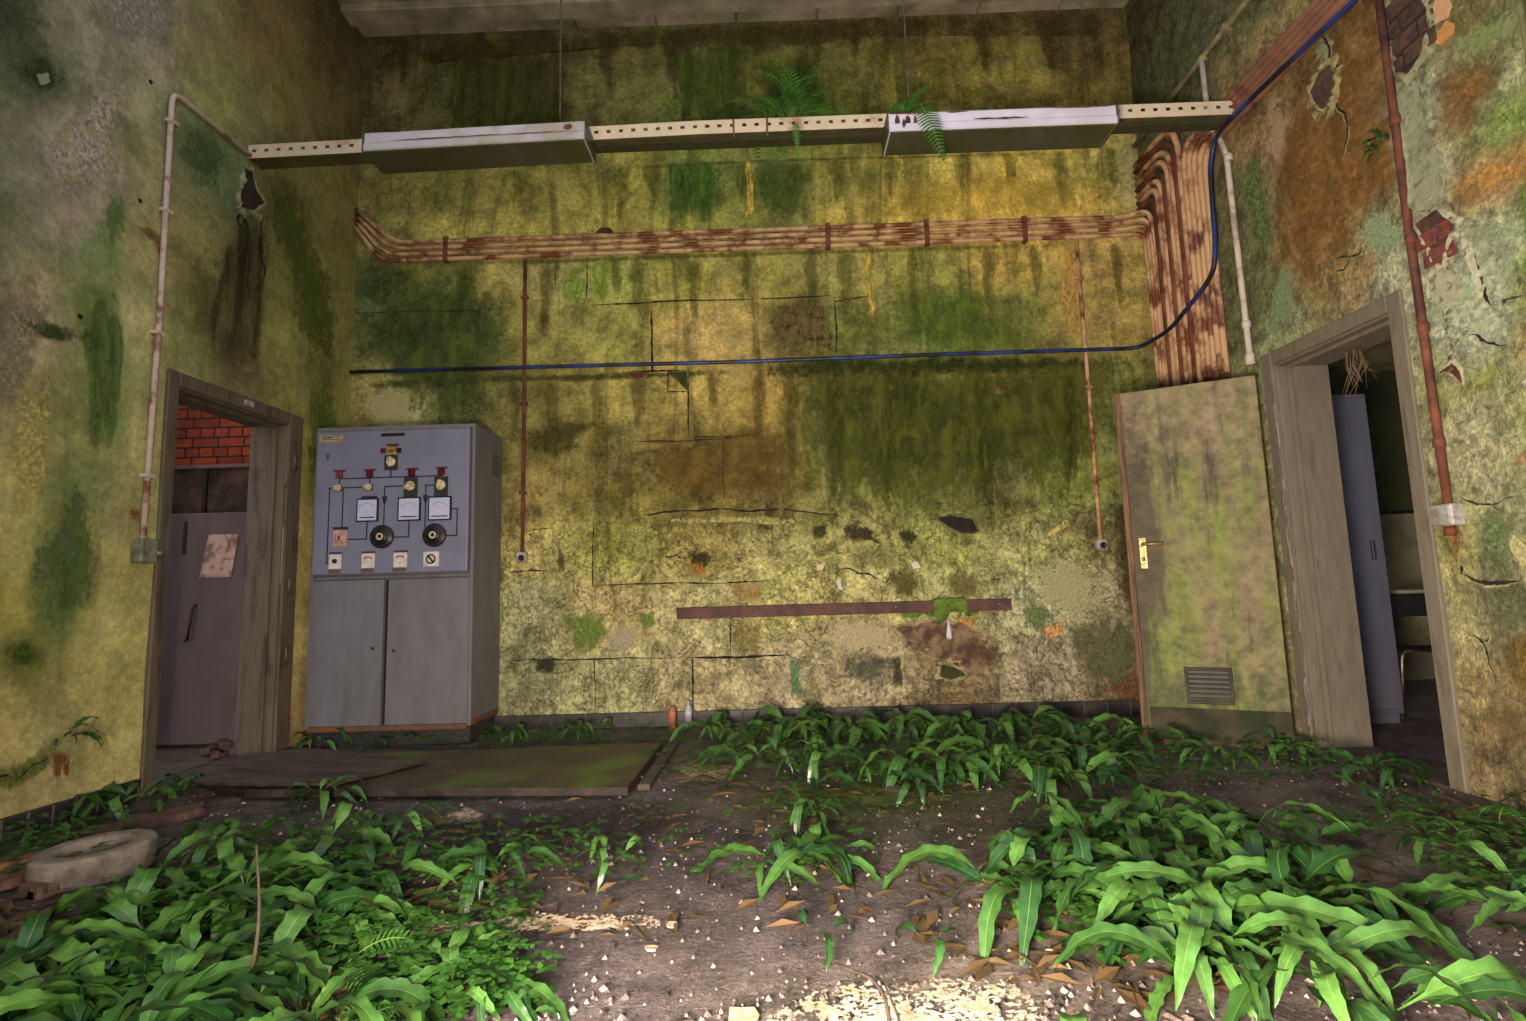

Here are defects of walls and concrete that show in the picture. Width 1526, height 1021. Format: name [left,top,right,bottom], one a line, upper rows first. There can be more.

flaking render [1305,35,1345,123]
leakage [23,58,132,202]
leakage [1279,14,1394,270]
flaking render [236,161,268,222]
peeling [1357,0,1512,386]
leakage [0,278,76,504]
leakage [813,524,881,544]
flaking render [935,514,979,536]
leakage [532,657,556,673]
leakage [846,657,903,687]
flaking render [828,618,999,685]
crack [0,751,55,780]